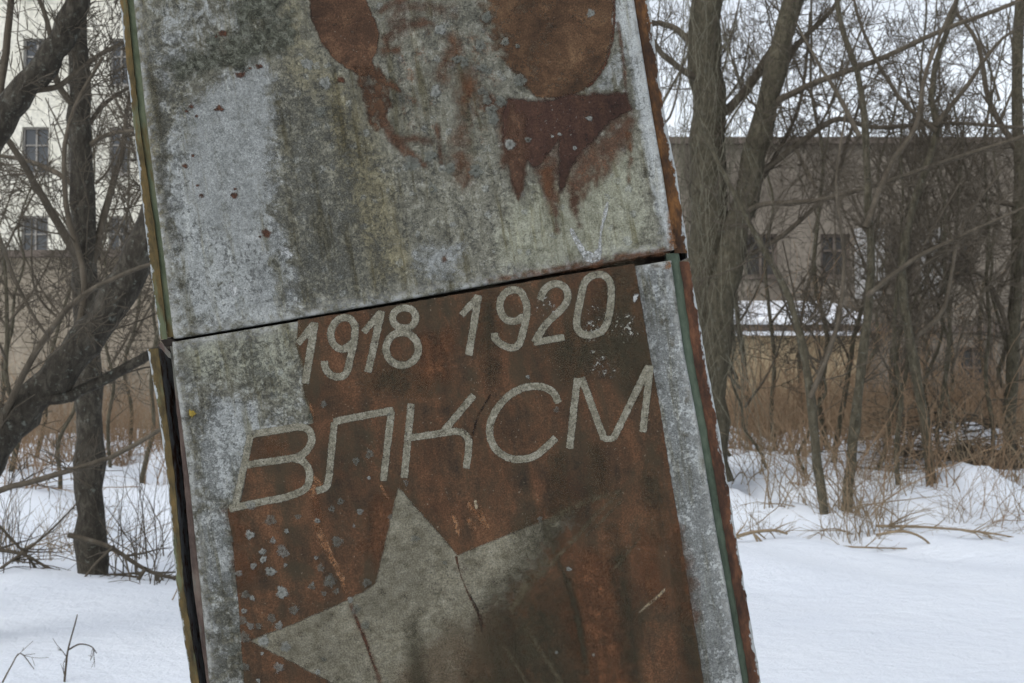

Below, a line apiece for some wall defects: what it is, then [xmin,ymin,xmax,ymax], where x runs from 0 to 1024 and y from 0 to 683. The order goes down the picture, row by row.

crack [455,556,485,628]